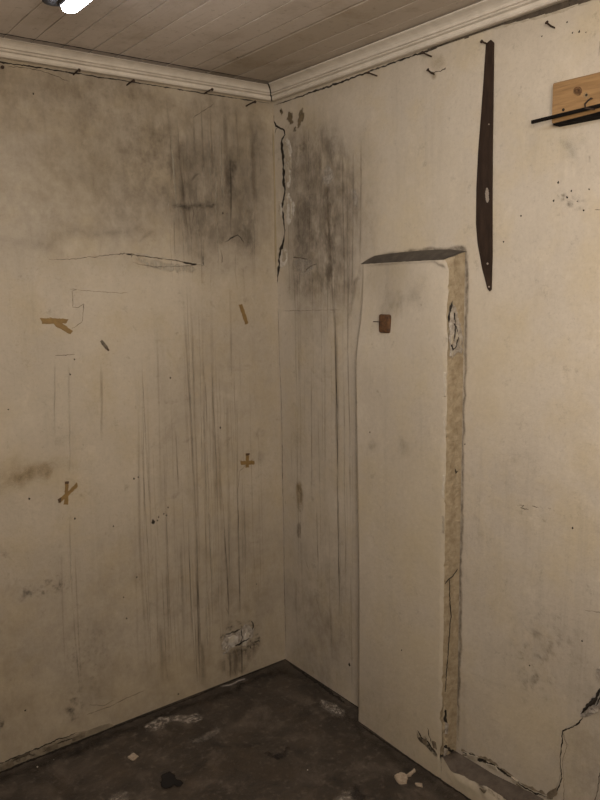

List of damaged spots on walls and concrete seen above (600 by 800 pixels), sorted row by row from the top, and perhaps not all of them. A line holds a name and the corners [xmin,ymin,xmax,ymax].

crack [0,33,445,282]
flaking render [448,301,463,358]
flaking render [221,621,260,660]
flaking render [580,667,600,718]
flaking render [417,703,454,756]